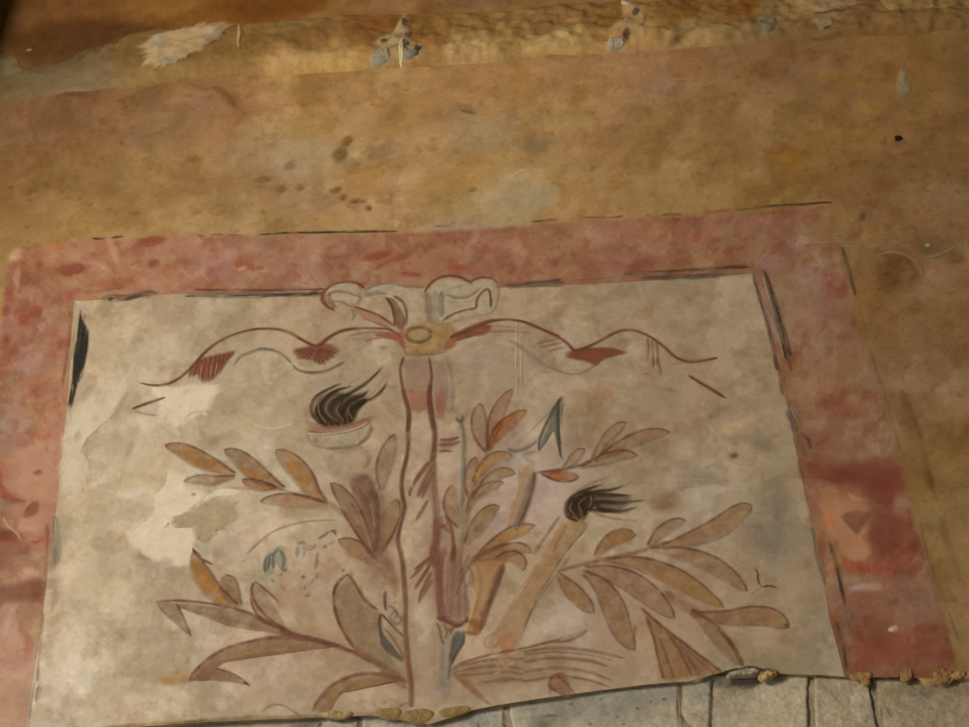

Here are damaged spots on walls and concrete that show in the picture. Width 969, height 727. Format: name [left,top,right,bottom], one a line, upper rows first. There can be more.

flaking render [142,24,239,65]
spalling [370,15,422,69]
spalling [607,0,644,53]
peeling [60,391,122,487]
peeling [128,475,237,564]